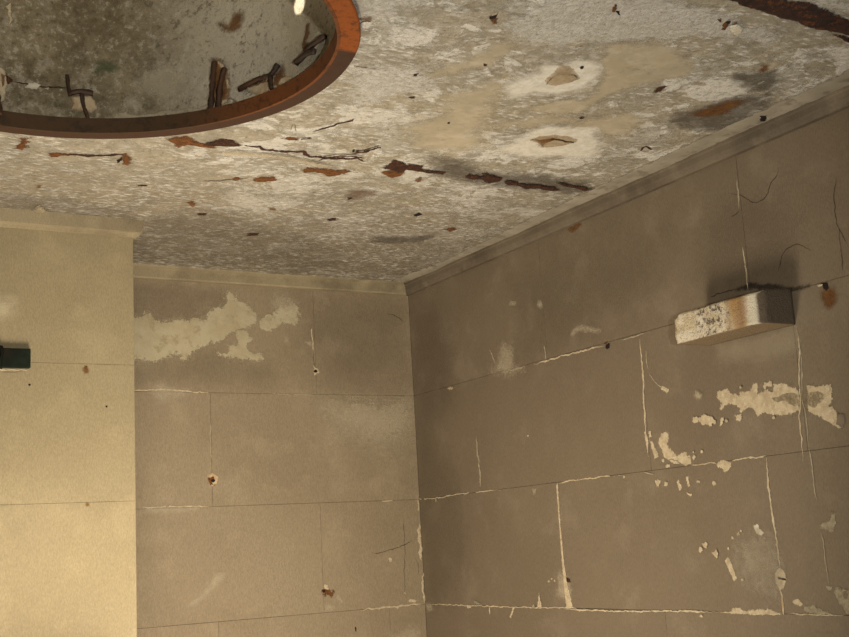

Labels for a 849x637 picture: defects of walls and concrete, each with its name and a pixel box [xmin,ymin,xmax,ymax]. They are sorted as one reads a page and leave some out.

corrosion [219,14,242,31]
corrosion [717,18,744,35]
spalling [65,74,97,118]
spalling [207,59,293,109]
water stain [503,60,603,99]
water stain [735,71,777,91]
water stain [499,117,606,159]
corrosion [302,167,351,177]
flaking render [134,291,301,364]
flaking render [692,380,845,429]
flaking render [648,431,703,468]
peeling [699,529,744,581]